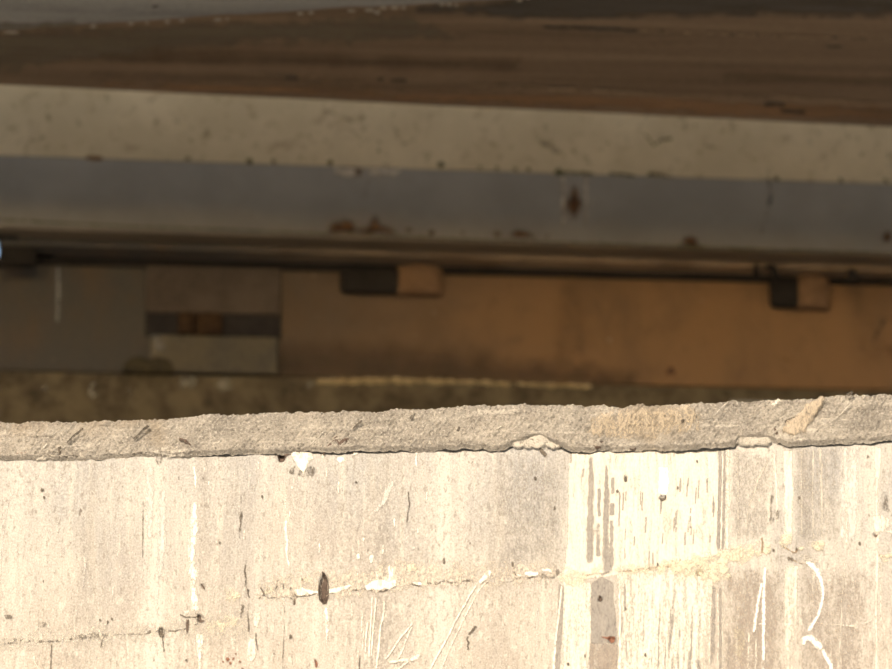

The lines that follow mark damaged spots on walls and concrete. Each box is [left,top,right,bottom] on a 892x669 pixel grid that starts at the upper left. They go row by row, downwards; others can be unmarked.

corrosion [566,186,581,219]
crack [8,614,198,669]
crack [240,558,488,667]
damp [259,447,863,669]
damp [873,447,892,669]